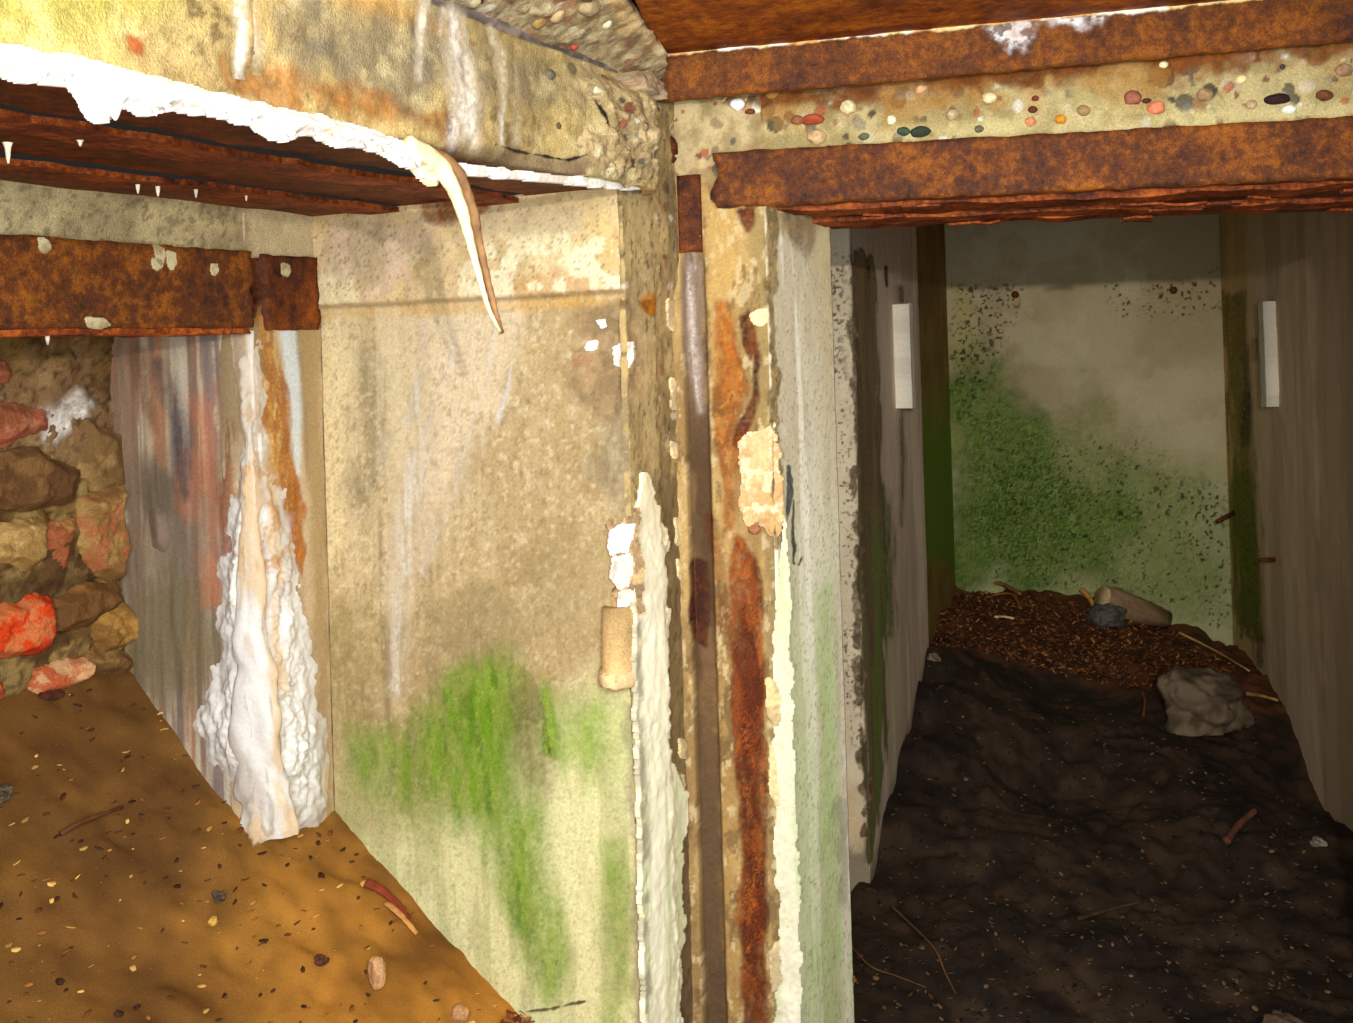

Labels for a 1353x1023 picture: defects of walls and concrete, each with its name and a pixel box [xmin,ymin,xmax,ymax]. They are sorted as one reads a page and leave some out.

leakage [0,0,640,334]
corrosion [737,209,754,231]
corrosion [1120,196,1271,223]
leakage [214,406,232,554]
corrosion [257,312,306,573]
flaking render [665,298,675,331]
flaking render [669,377,677,410]
flaking render [669,441,679,459]
mould [954,287,1016,401]
mould [990,431,1228,624]
corrosion [715,303,768,1023]
flaking render [629,472,690,1023]